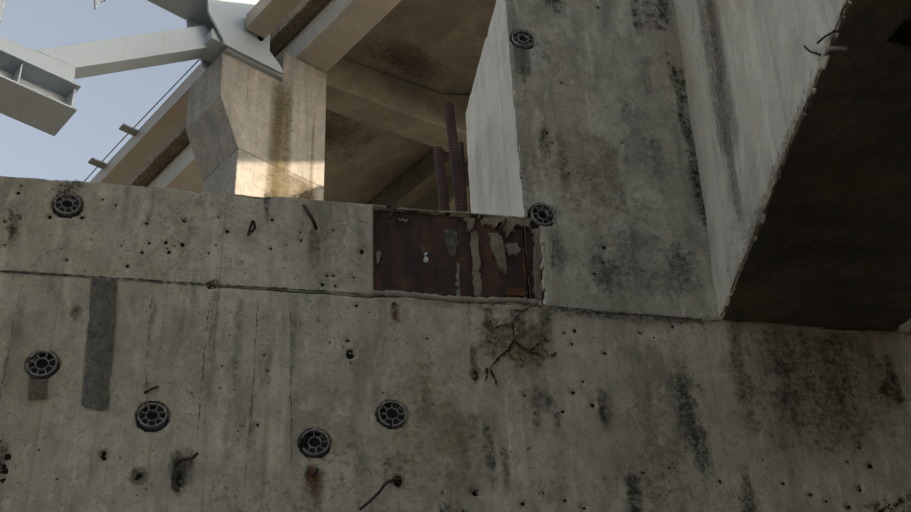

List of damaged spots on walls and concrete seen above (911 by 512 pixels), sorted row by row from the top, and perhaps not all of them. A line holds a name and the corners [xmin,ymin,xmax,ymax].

crack [484,304,719,386]
peeling [0,440,12,484]